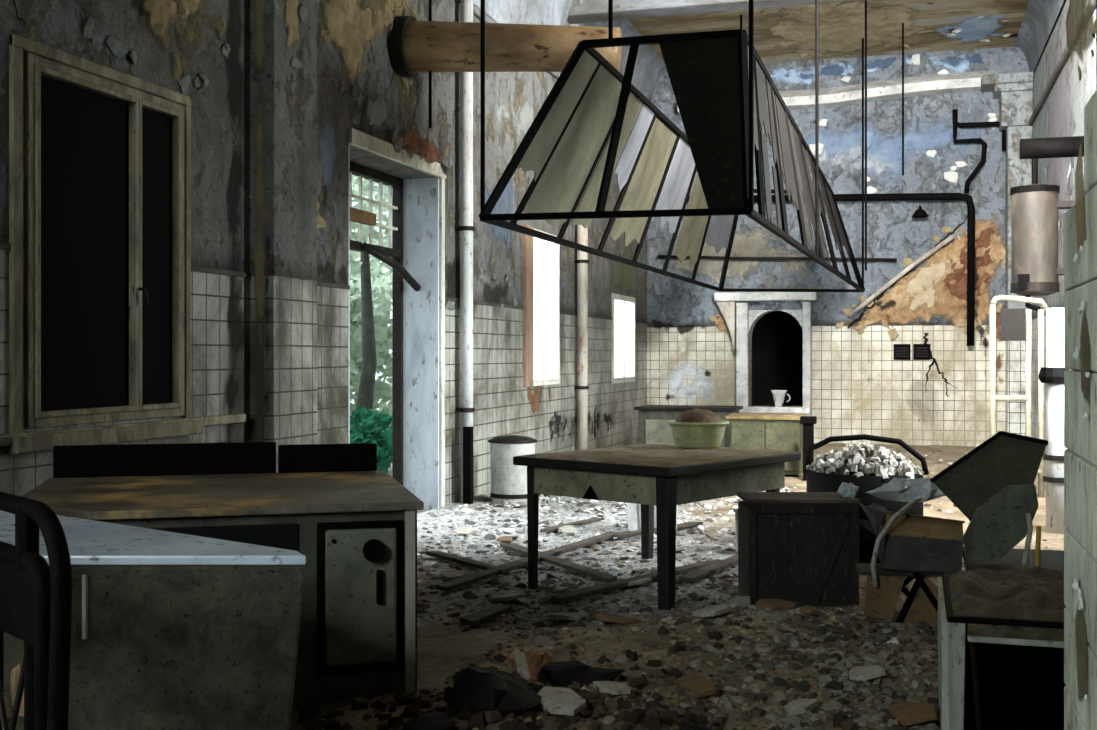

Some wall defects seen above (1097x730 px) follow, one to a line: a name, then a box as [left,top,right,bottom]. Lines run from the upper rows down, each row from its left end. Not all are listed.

peeling [770,15,1011,84]